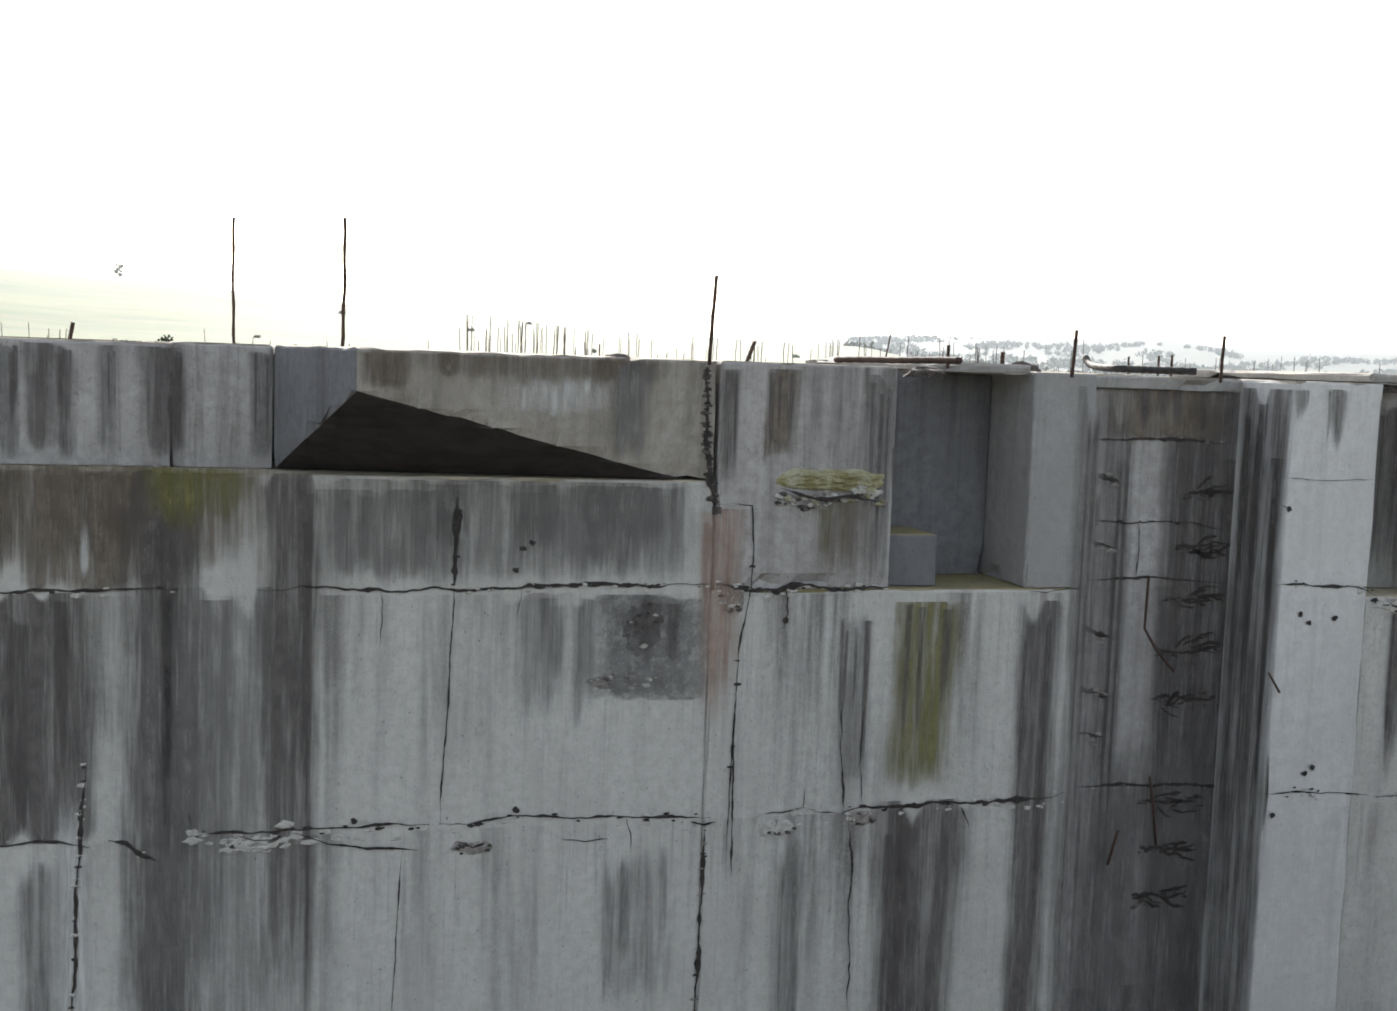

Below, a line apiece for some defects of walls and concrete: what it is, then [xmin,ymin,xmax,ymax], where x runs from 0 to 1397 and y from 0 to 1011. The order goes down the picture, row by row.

water stain [384,481,662,573]
water stain [0,342,318,1011]
crack [0,367,1235,1011]
water stain [577,594,700,700]
water stain [840,621,870,755]
water stain [1005,388,1306,1011]
crack [1274,580,1397,613]
spalling [217,834,304,856]
water stain [880,799,960,1011]
crack [1274,787,1397,800]